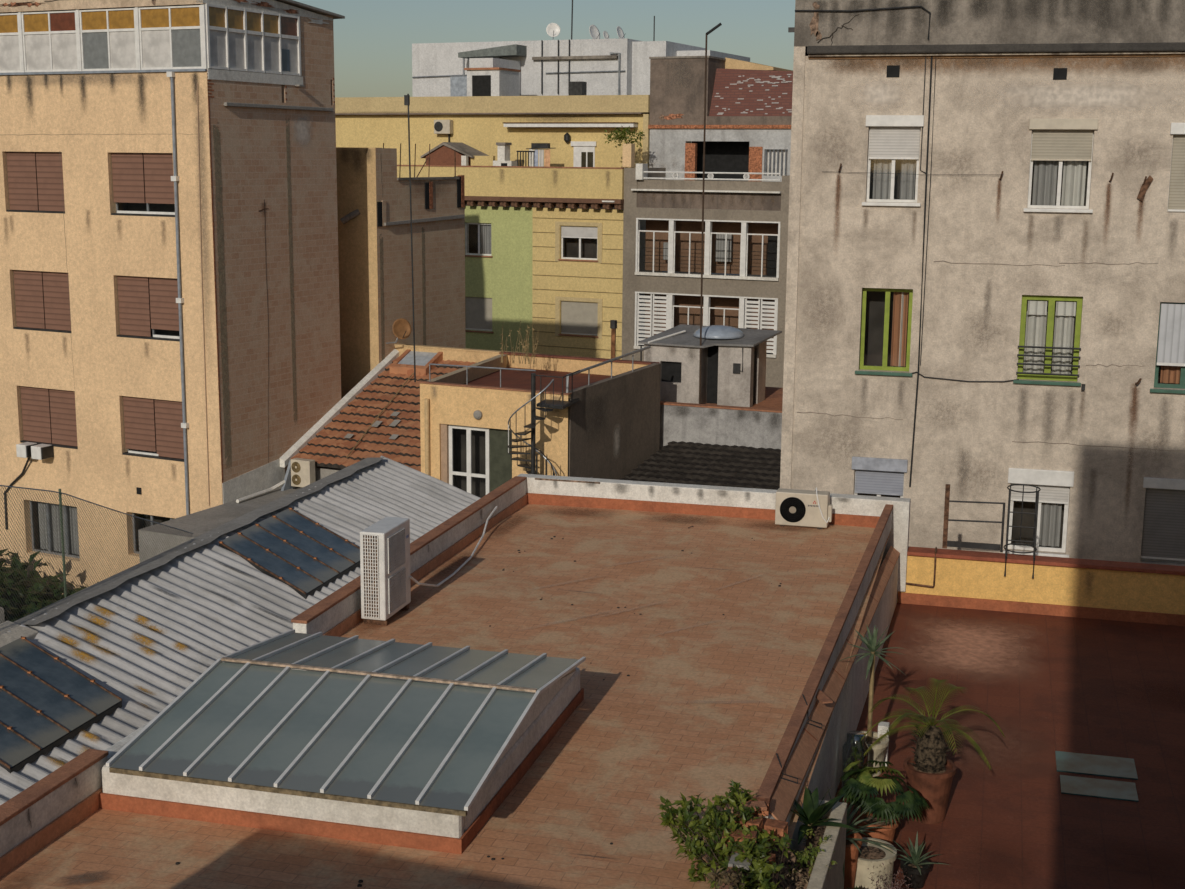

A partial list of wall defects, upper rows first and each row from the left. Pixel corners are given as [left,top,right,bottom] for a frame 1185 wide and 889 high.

crack [817,15,858,45]